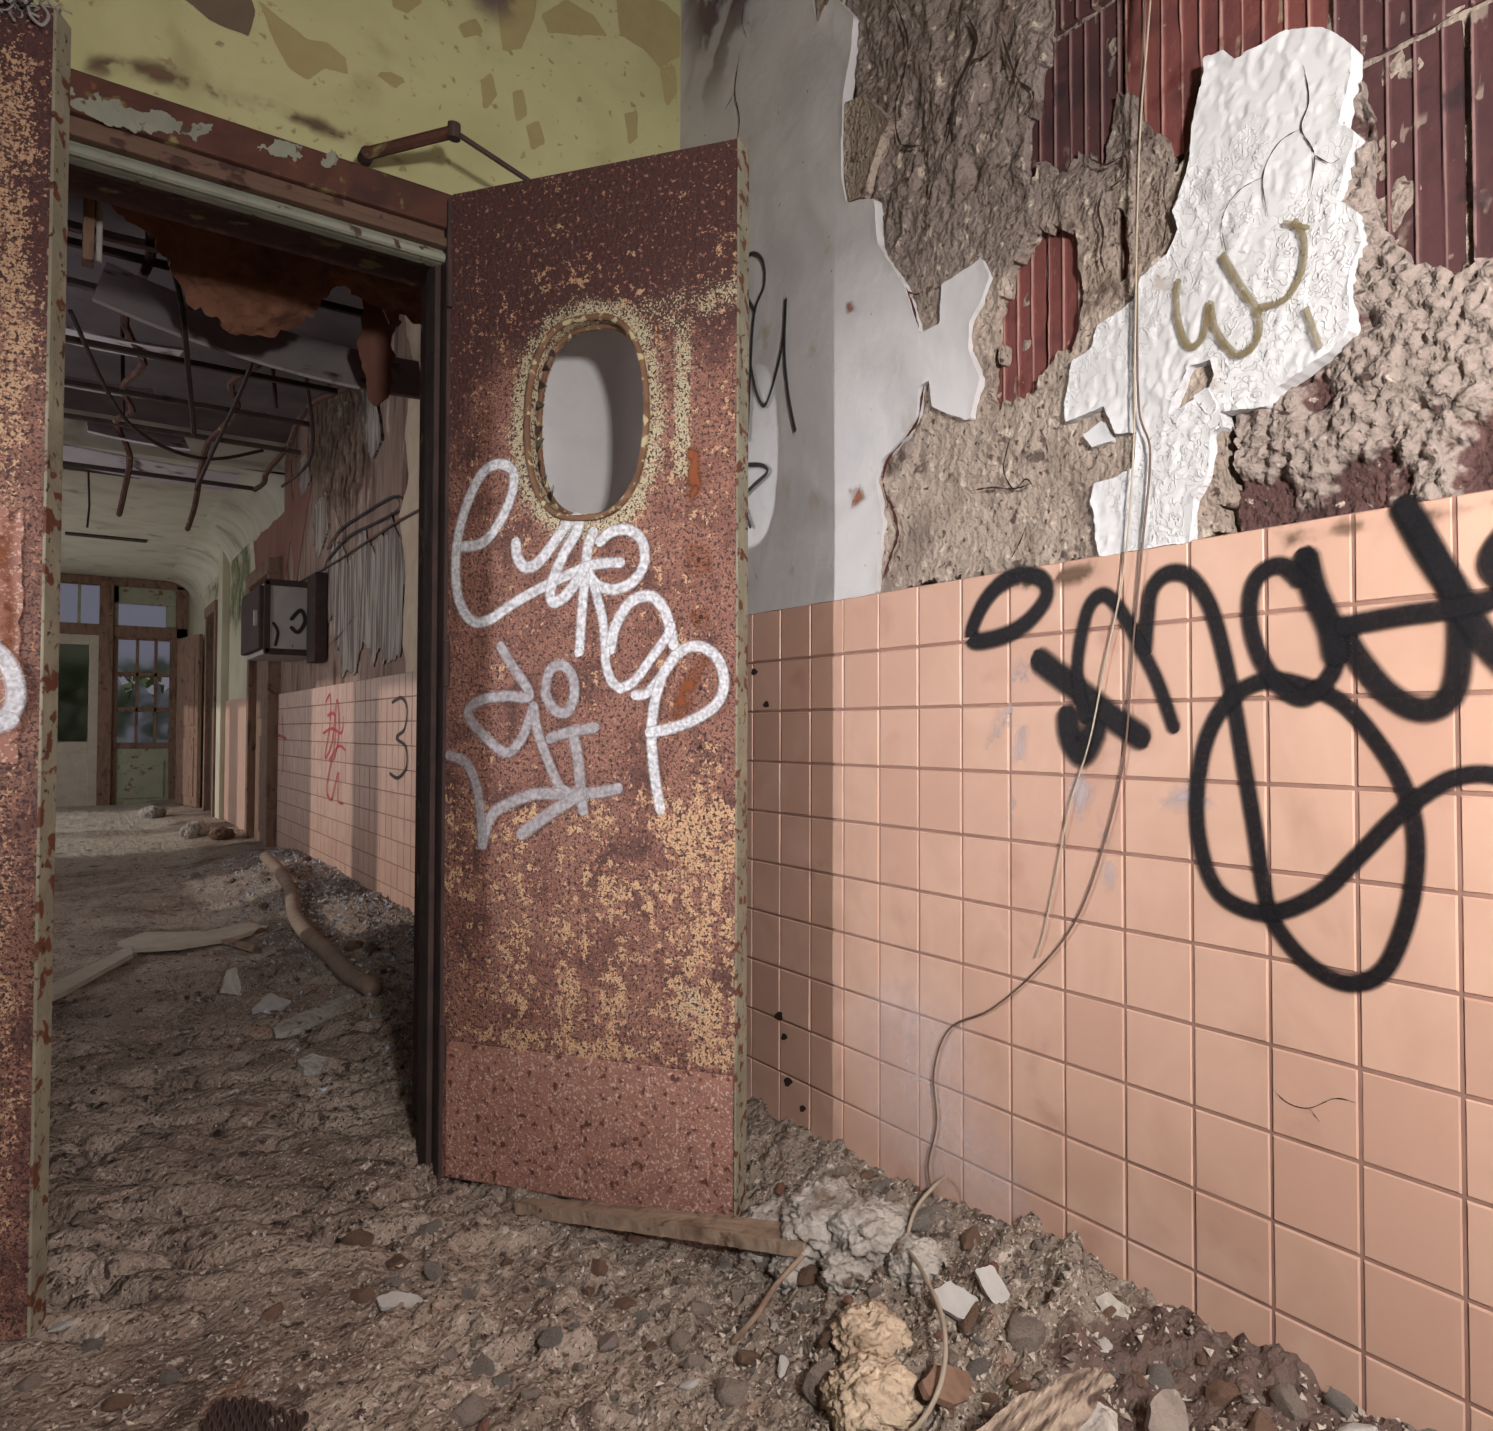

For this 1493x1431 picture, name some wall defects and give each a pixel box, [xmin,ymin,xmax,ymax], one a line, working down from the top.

peeling [180,0,348,79]
peeling [378,72,405,88]
peeling [392,0,421,14]
peeling [481,73,545,150]
peeling [458,0,680,106]
peeling [625,111,638,145]
spalling [816,0,1493,593]
peeling [405,315,421,367]
peeling [253,390,420,678]